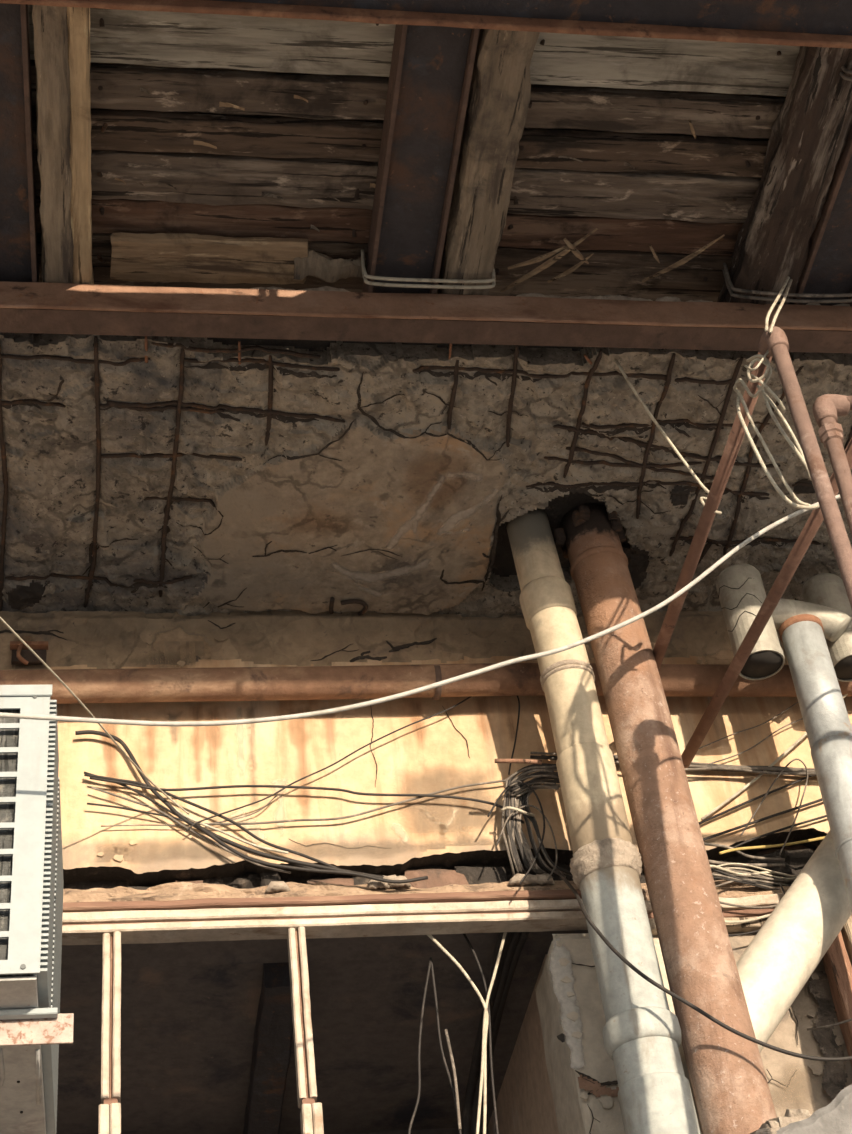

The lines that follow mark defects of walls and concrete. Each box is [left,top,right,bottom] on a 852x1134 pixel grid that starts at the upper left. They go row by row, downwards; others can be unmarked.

spalling [789,352,852,479]
spalling [0,332,842,618]
corrosion [553,505,590,558]
spalling [836,492,852,547]
crack [0,629,68,641]
crack [311,638,437,662]
leakage [105,844,220,859]
leakage [229,810,264,855]
leakage [411,772,486,849]
flaking render [550,938,619,1109]